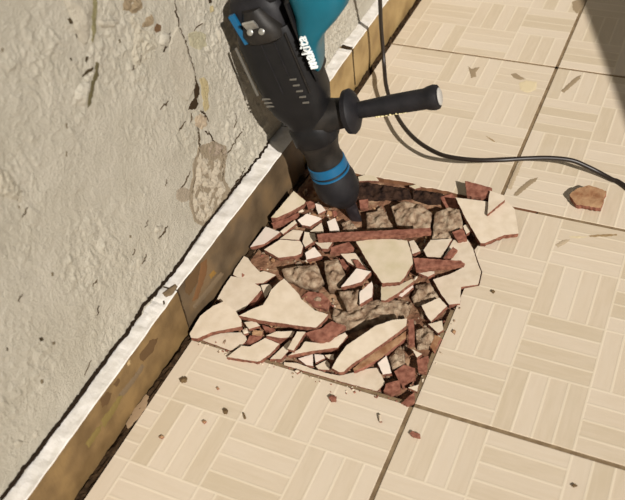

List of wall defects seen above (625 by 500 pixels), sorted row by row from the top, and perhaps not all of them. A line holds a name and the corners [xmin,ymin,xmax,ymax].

crack [163,4,203,82]
peeling [189,139,242,226]